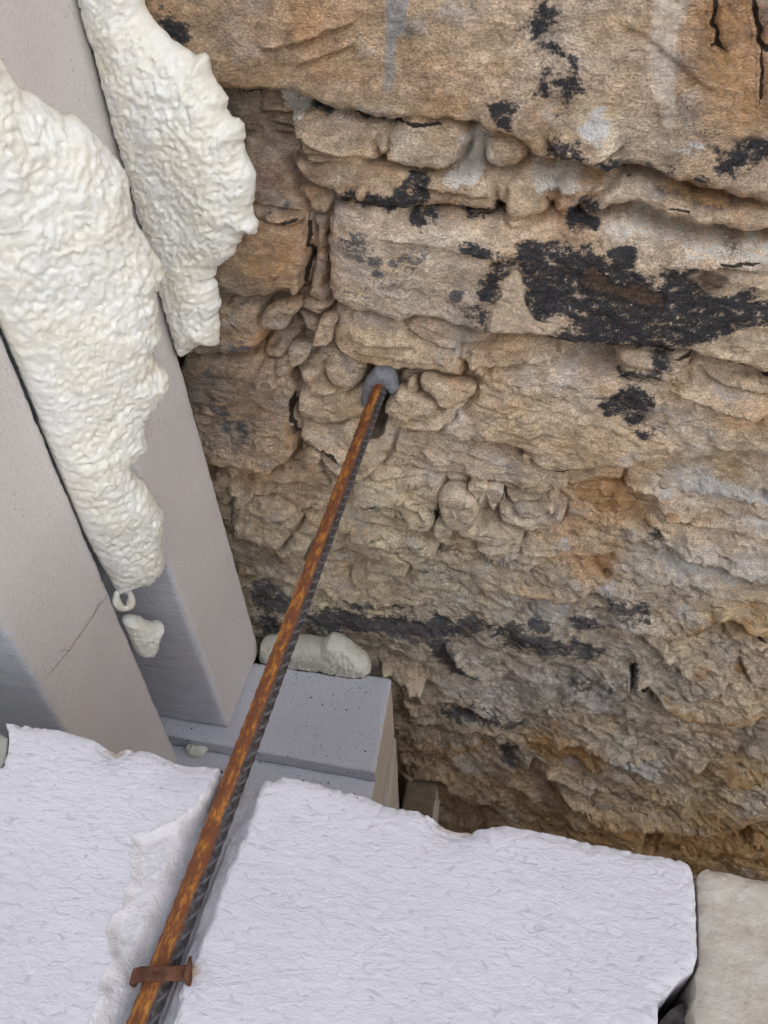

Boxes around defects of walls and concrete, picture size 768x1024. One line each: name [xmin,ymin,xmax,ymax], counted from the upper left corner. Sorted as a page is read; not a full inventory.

leakage [483,0,768,189]
crack [706,0,768,107]
leakage [326,166,768,445]
corrosion [225,404,304,490]
corrosion [180,957,207,990]